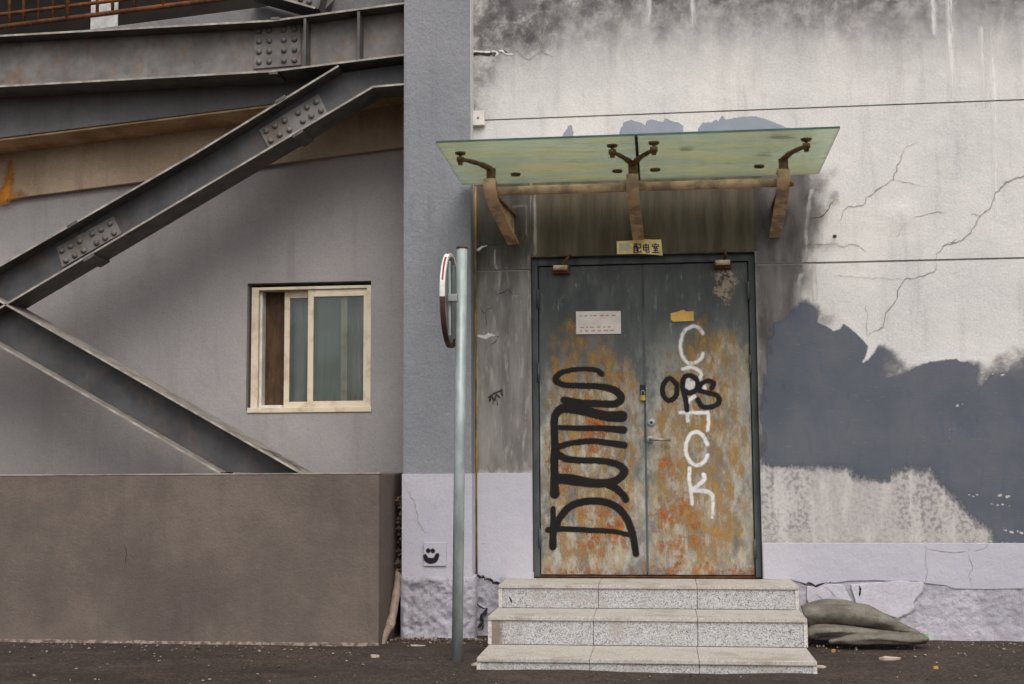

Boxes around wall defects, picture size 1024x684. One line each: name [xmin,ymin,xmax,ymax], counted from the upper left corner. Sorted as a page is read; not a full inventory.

damp [475,0,564,41]
damp [931,0,954,89]
peeling [620,119,683,134]
peeling [698,116,786,131]
rust [0,161,21,204]
crack [802,143,915,251]
damp [474,174,824,473]
peeling [713,269,740,306]
crack [839,176,1024,333]
rust [541,320,754,575]
flaking render [760,458,1023,543]
crack [801,582,861,601]